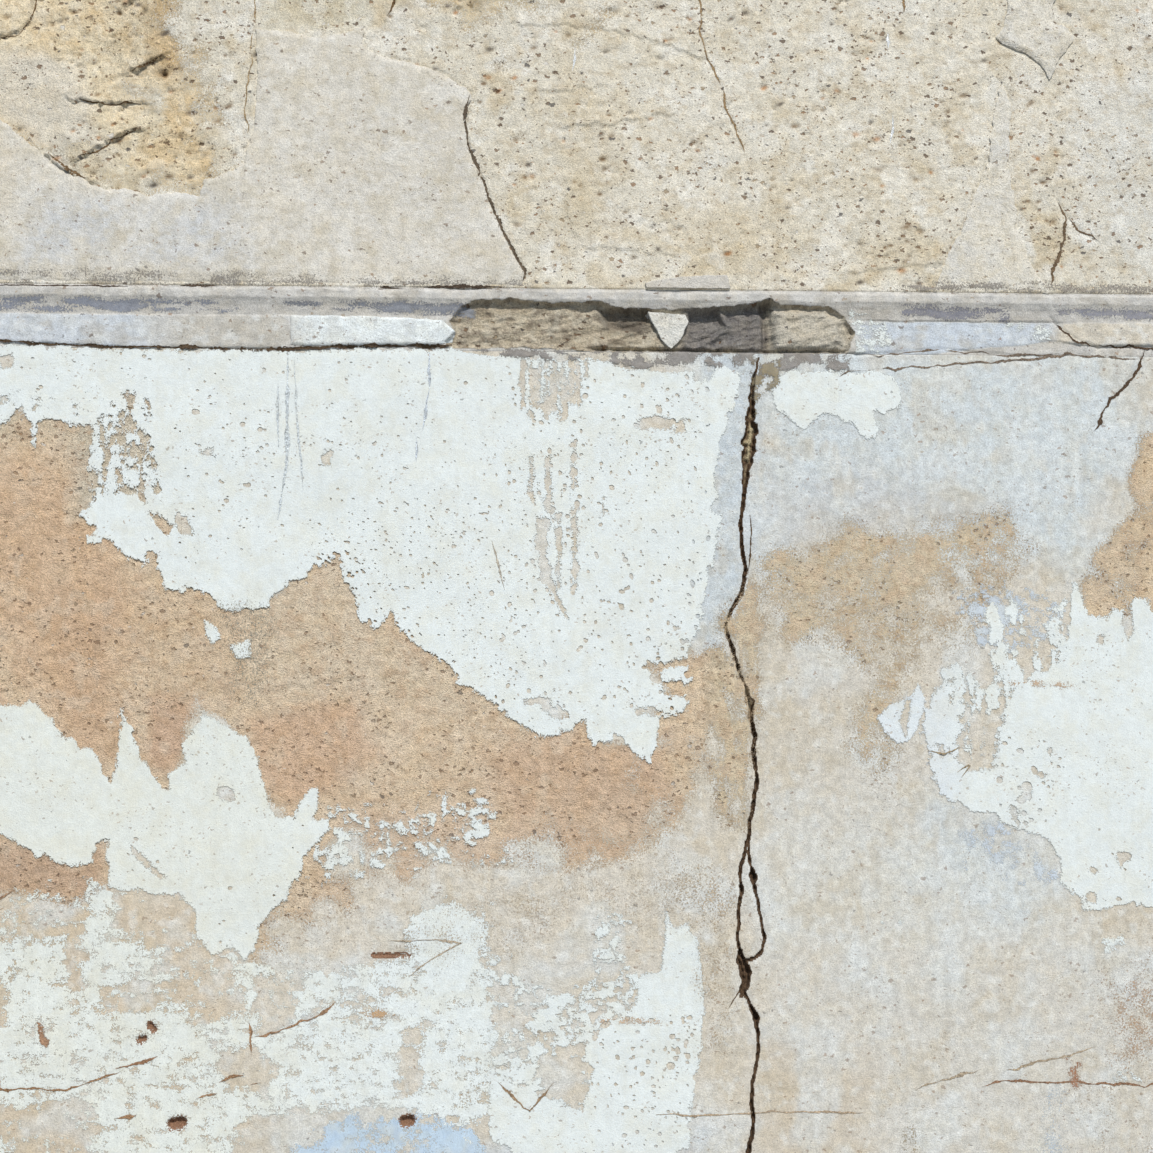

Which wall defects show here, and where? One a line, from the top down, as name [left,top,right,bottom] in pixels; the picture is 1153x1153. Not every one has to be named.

spalling [419,0,559,36]
spalling [561,2,617,50]
crack [463,94,527,280]
crack [0,281,120,289]
crack [180,281,215,289]
crack [380,282,495,290]
crack [839,322,1153,431]
peeling [0,297,1153,1153]
crack [724,357,767,1153]